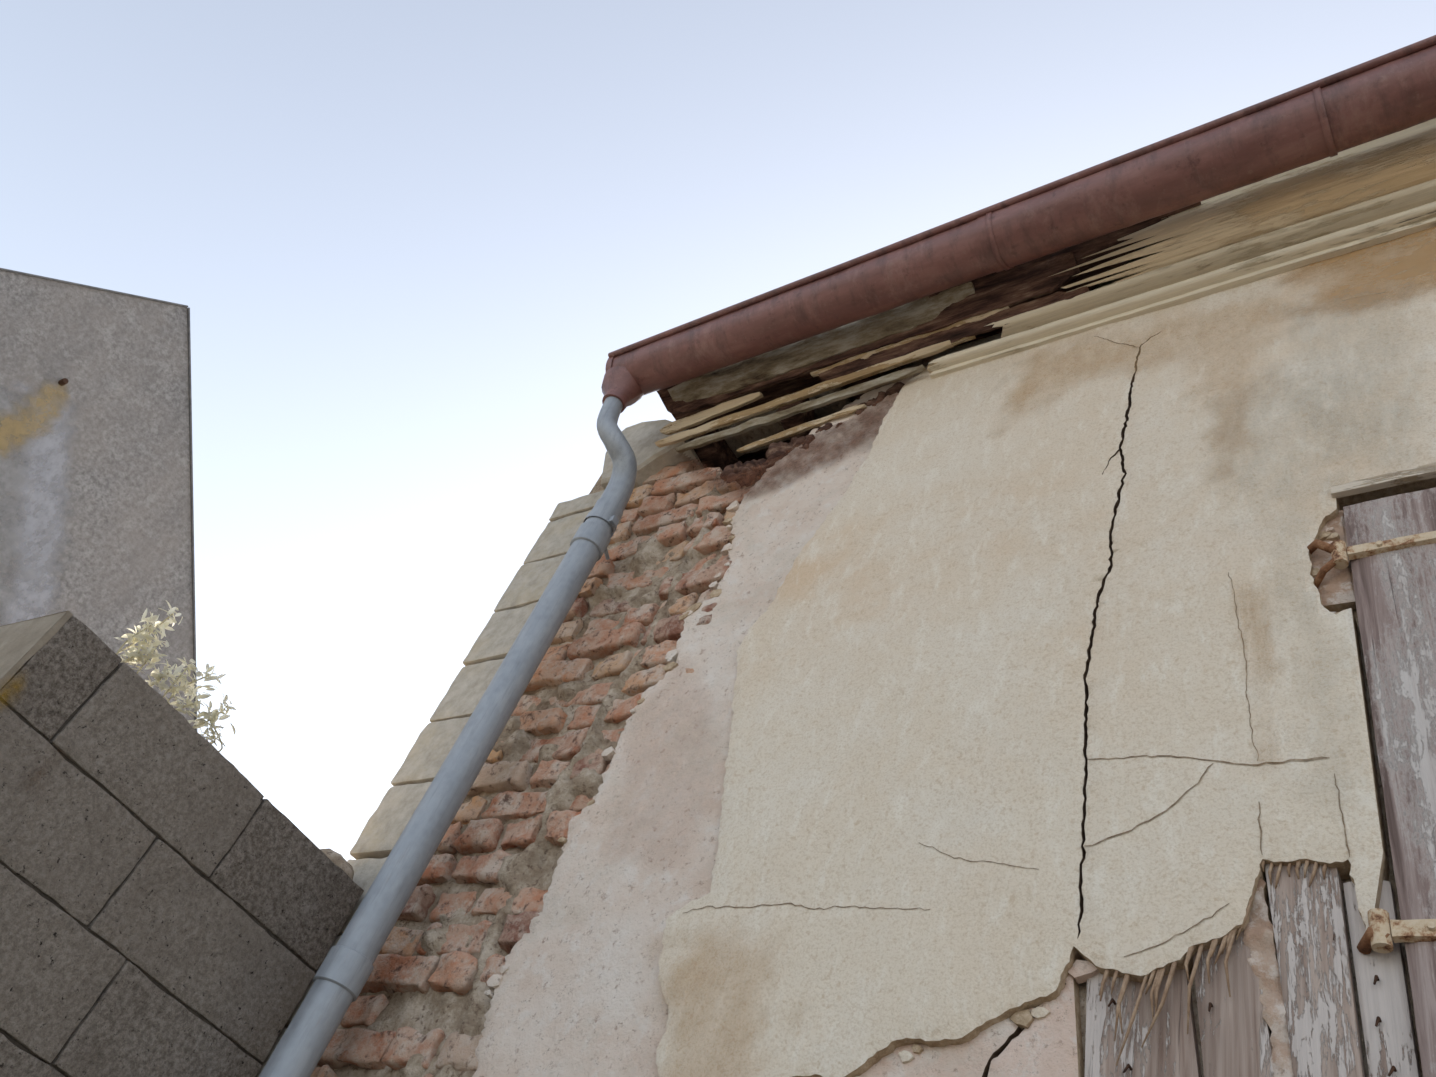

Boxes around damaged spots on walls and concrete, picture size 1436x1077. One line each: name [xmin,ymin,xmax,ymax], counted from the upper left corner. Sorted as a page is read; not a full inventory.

water stain [1306,227,1436,307]
crack [1077,332,1350,939]
peeling [310,354,936,1077]
crack [920,843,1039,870]
crack [684,903,930,913]
crack [1124,904,1228,957]
crack [982,1007,1036,1077]